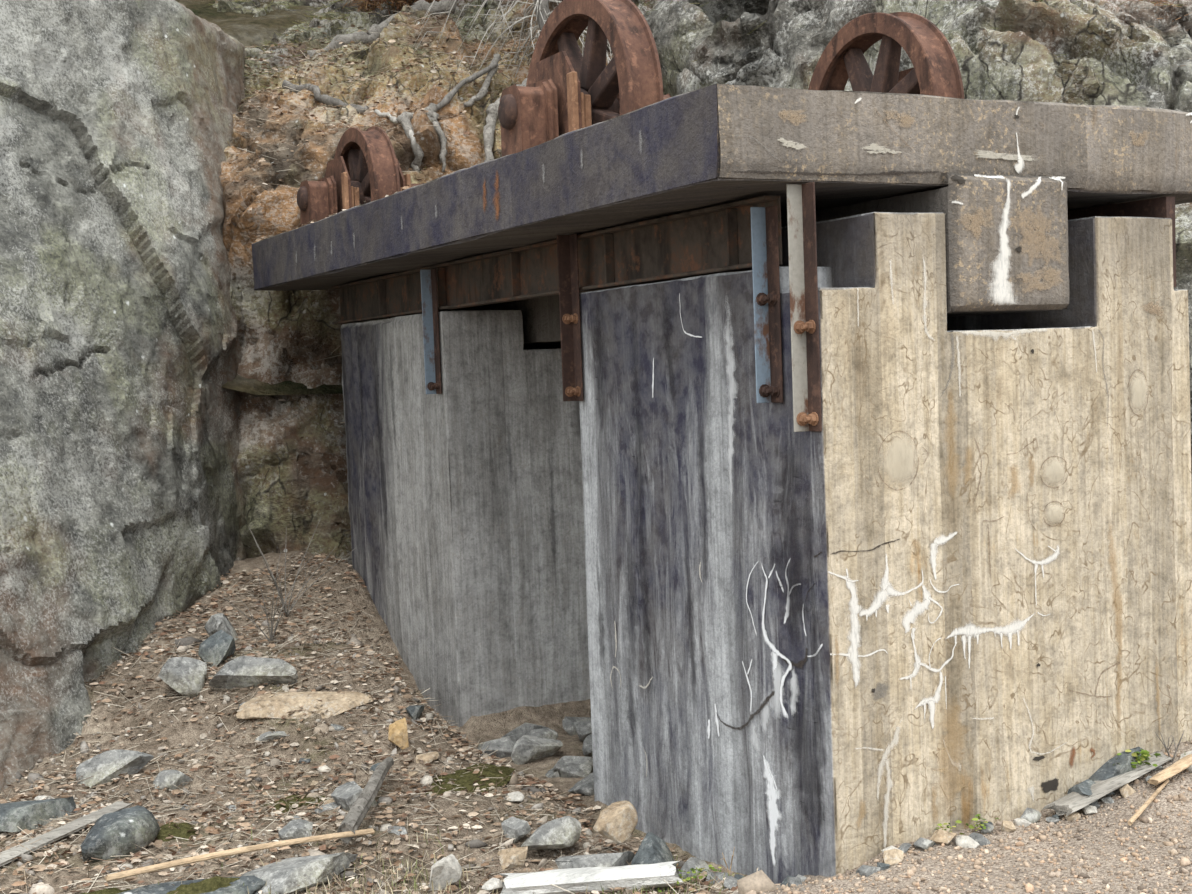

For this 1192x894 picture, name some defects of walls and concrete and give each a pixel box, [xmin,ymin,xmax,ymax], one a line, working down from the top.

damp [726,323,736,501]
damp [752,664,798,752]